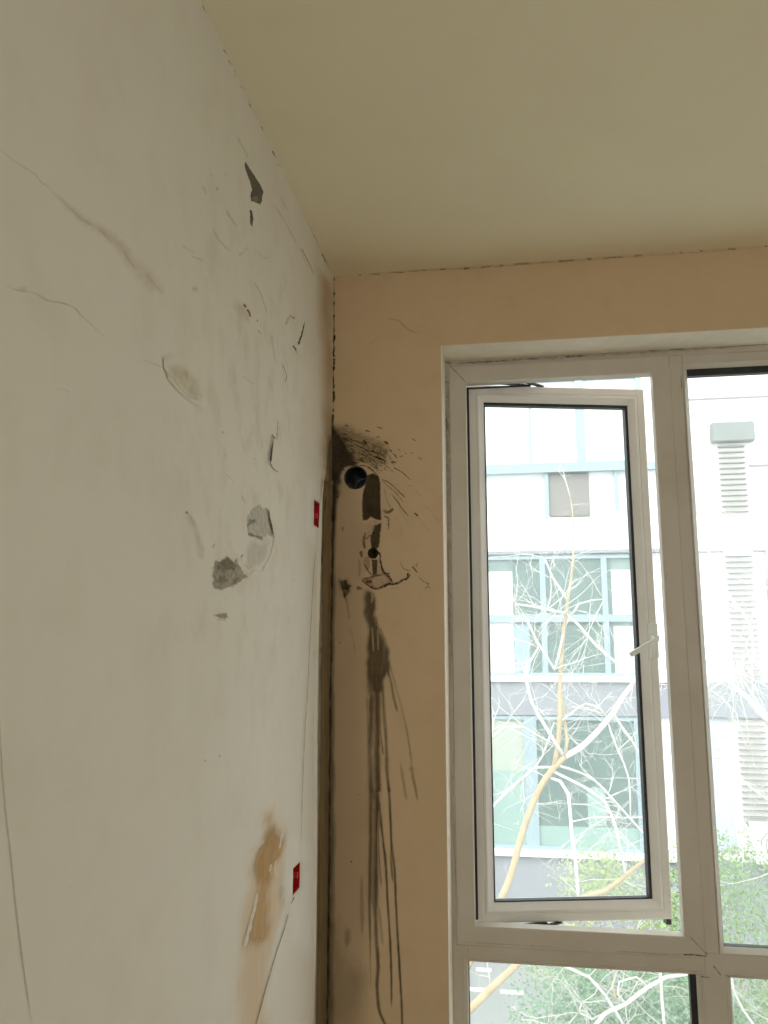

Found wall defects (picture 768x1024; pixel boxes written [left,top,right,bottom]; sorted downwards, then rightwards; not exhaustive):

crack [46,185,166,297]
flaking render [241,155,266,230]
flaking render [213,500,277,589]
damp [326,424,422,1024]
corrosion [226,795,292,1024]